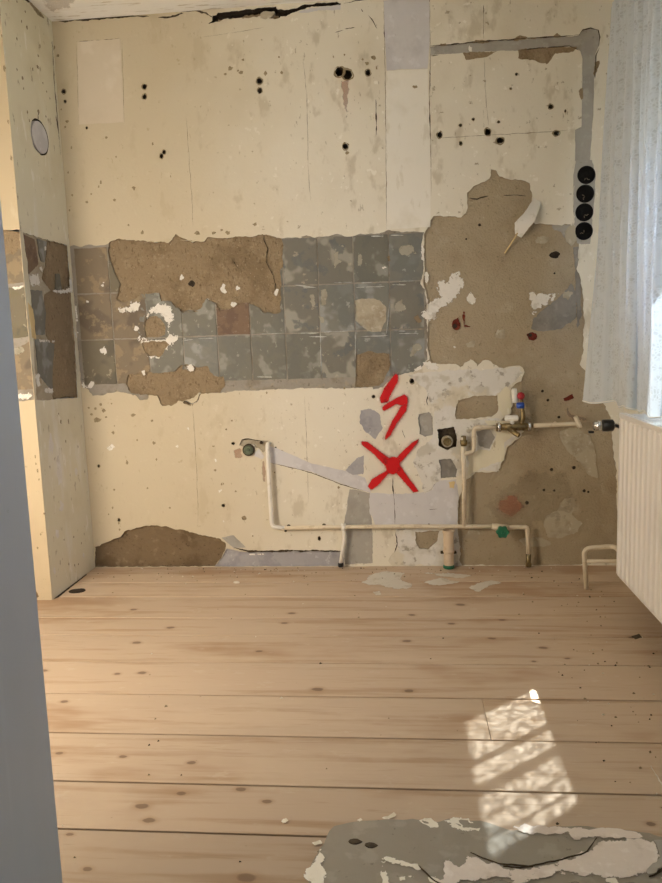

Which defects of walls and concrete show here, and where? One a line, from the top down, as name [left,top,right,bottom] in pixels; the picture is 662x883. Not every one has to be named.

crack [38,45,79,153]
crack [26,0,385,106]
crack [375,76,386,132]
crack [429,5,600,156]
flaking render [12,241,94,399]
spalling [126,364,225,406]
spalling [108,223,283,314]
spalling [388,169,618,566]
spalling [95,522,226,567]
crack [470,837,597,869]